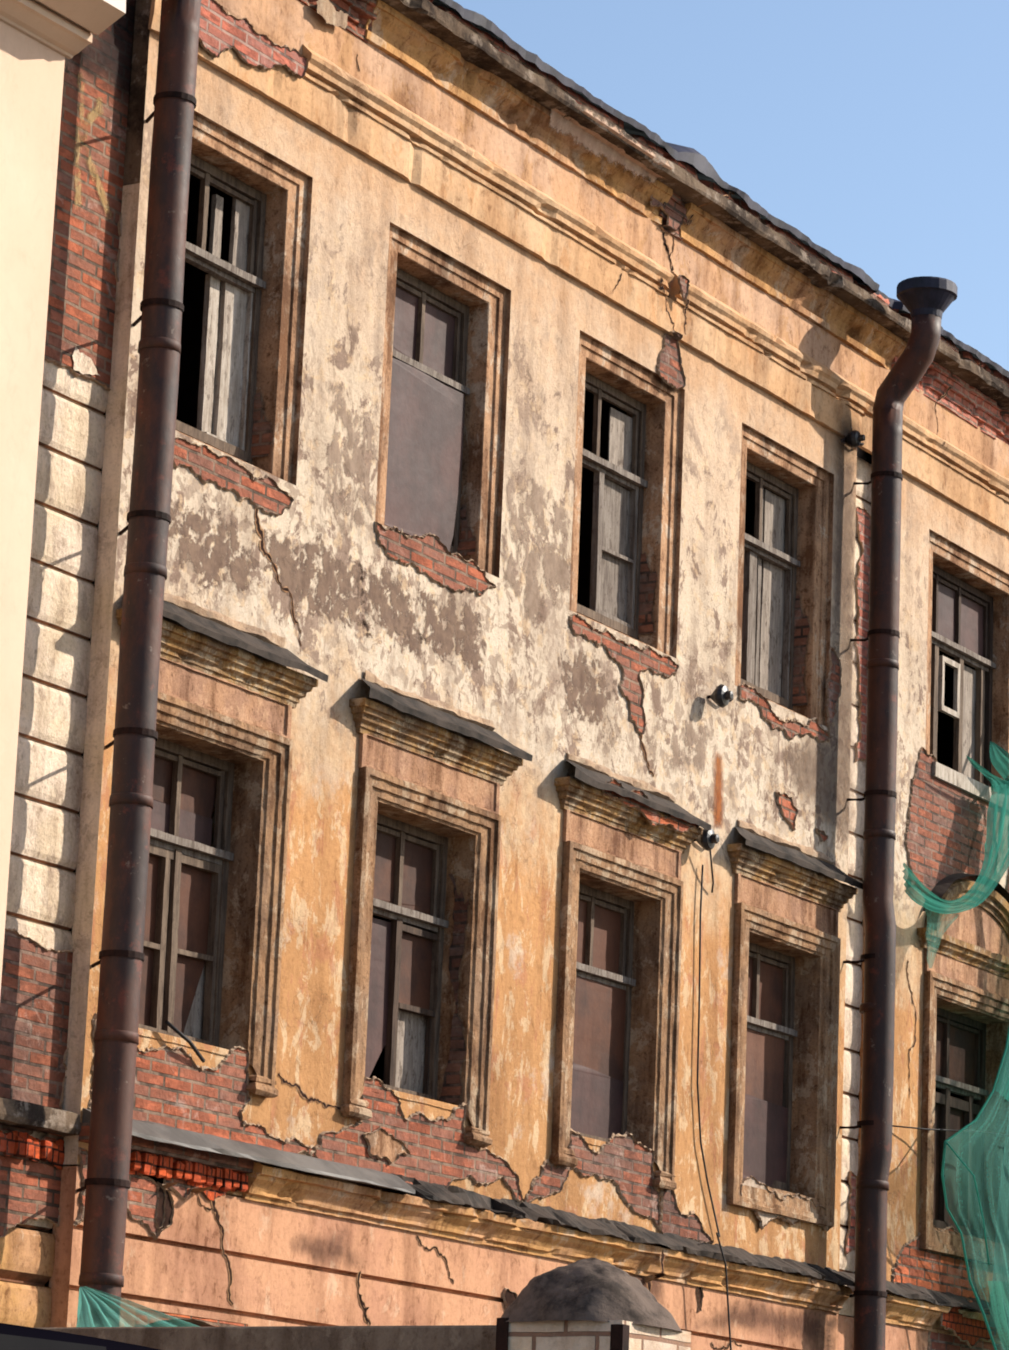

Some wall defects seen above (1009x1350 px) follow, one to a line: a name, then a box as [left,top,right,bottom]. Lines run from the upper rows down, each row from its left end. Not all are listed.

flaking render [44,27,129,391]
crack [659,191,735,334]
crack [254,509,302,647]
peeling [169,384,570,672]
flaking render [556,613,679,736]
flaking render [904,747,989,891]
flaking render [0,928,75,1110]
flaking render [0,1124,88,1238]
crack [163,1181,233,1305]
crack [357,1271,371,1326]
flaking render [127,1044,714,1244]
crack [416,1235,454,1284]